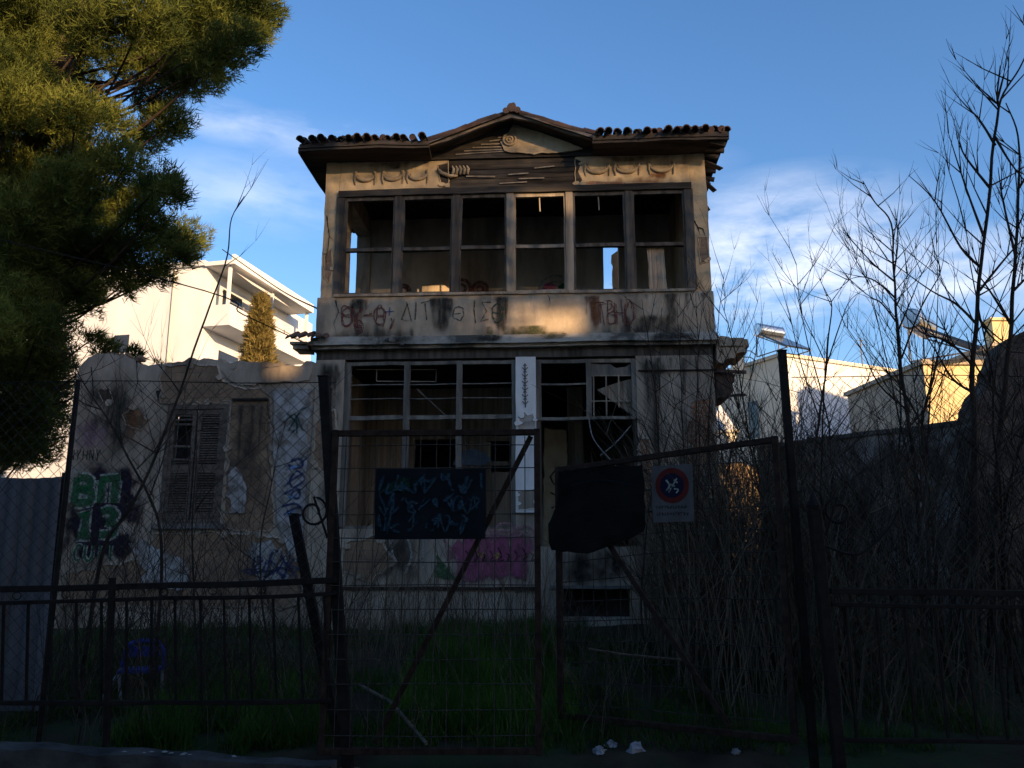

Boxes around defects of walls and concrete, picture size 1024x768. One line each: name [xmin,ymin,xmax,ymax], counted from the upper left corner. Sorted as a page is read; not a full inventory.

leakage [431,298,452,329]
leakage [479,297,566,341]
spalling [56,362,338,612]